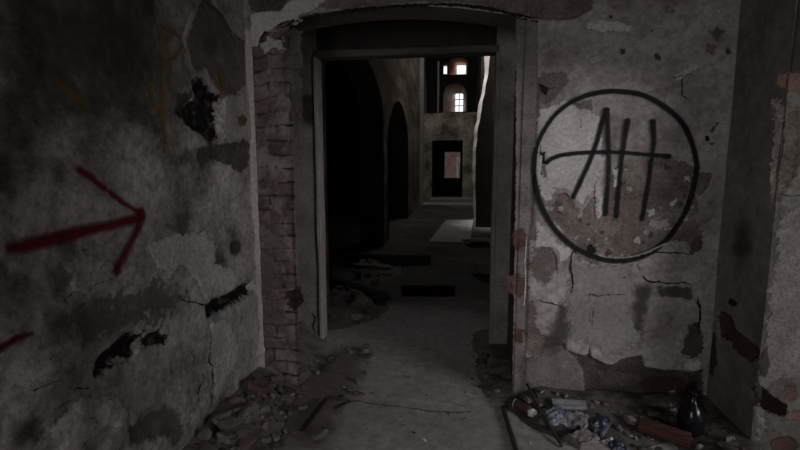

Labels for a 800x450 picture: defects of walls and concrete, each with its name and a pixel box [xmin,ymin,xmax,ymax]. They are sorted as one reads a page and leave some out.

spalling [175,0,250,173]
spalling [268,0,760,398]
spalling [769,98,800,203]
spalling [57,274,257,377]
crack [538,250,624,311]
damp [634,285,692,333]
crack [637,264,701,336]
spalling [751,385,798,417]